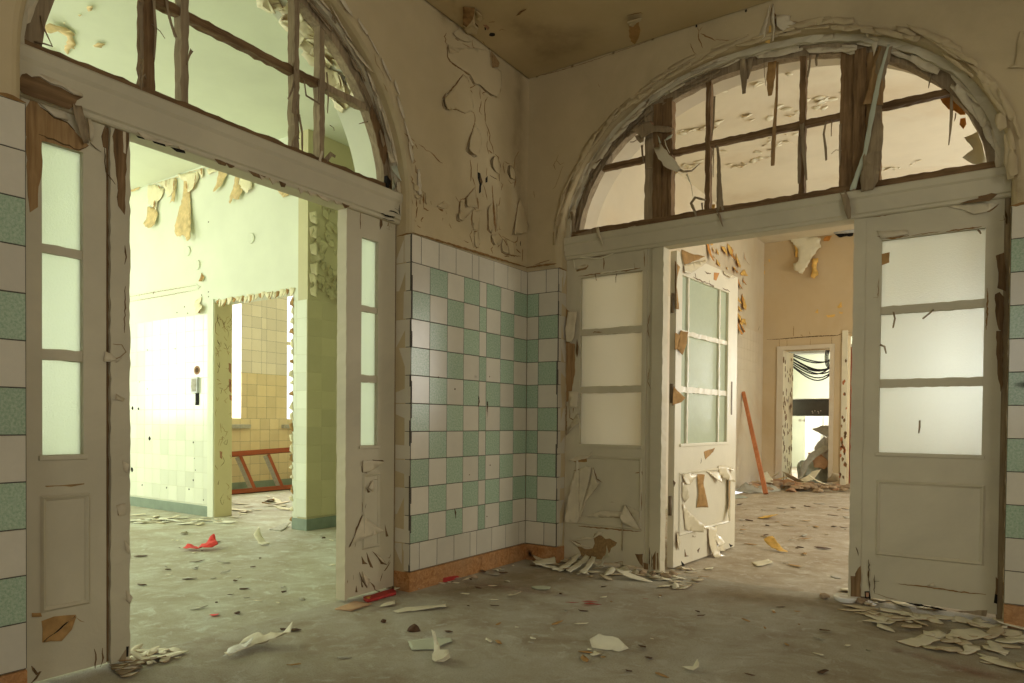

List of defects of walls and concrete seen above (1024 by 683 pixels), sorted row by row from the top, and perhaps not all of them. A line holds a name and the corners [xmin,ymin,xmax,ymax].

peeling [26,0,76,55]
peeling [137,0,177,90]
peeling [20,73,349,299]
flaking render [256,0,529,261]
peeling [553,4,1021,281]
flaking render [184,272,295,521]
peeling [672,386,685,406]
peeling [674,330,688,355]
peeling [675,244,759,335]
peeling [782,357,793,480]
peeling [839,380,847,479]
peeling [986,253,1006,392]